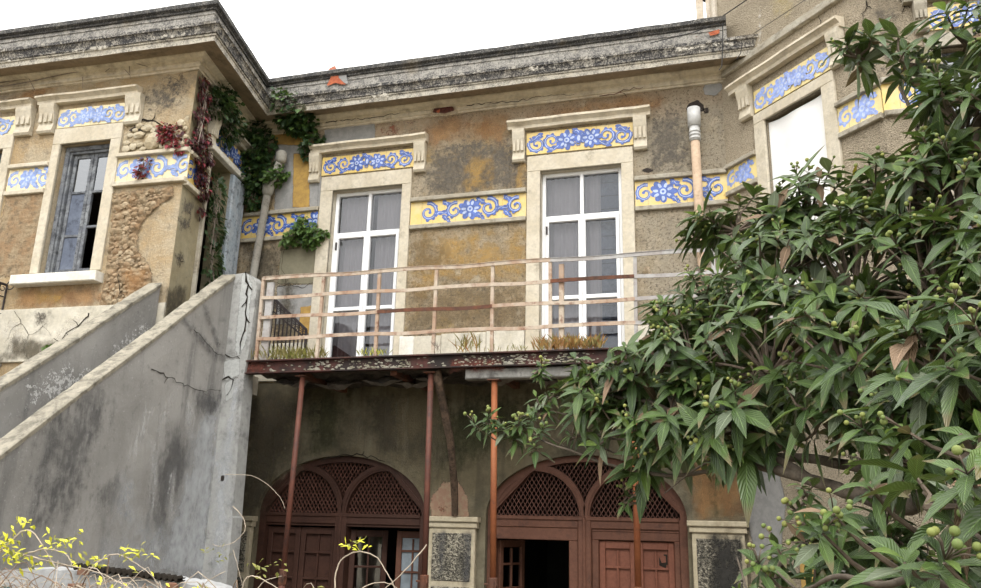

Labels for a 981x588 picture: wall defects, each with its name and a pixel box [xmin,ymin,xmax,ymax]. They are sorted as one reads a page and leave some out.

spalling [122,115,191,153]
flaking render [100,186,174,305]
crack [8,311,89,357]
crack [151,272,252,396]
corrosion [247,362,265,372]
corrosion [451,360,502,371]
damp [135,395,217,575]